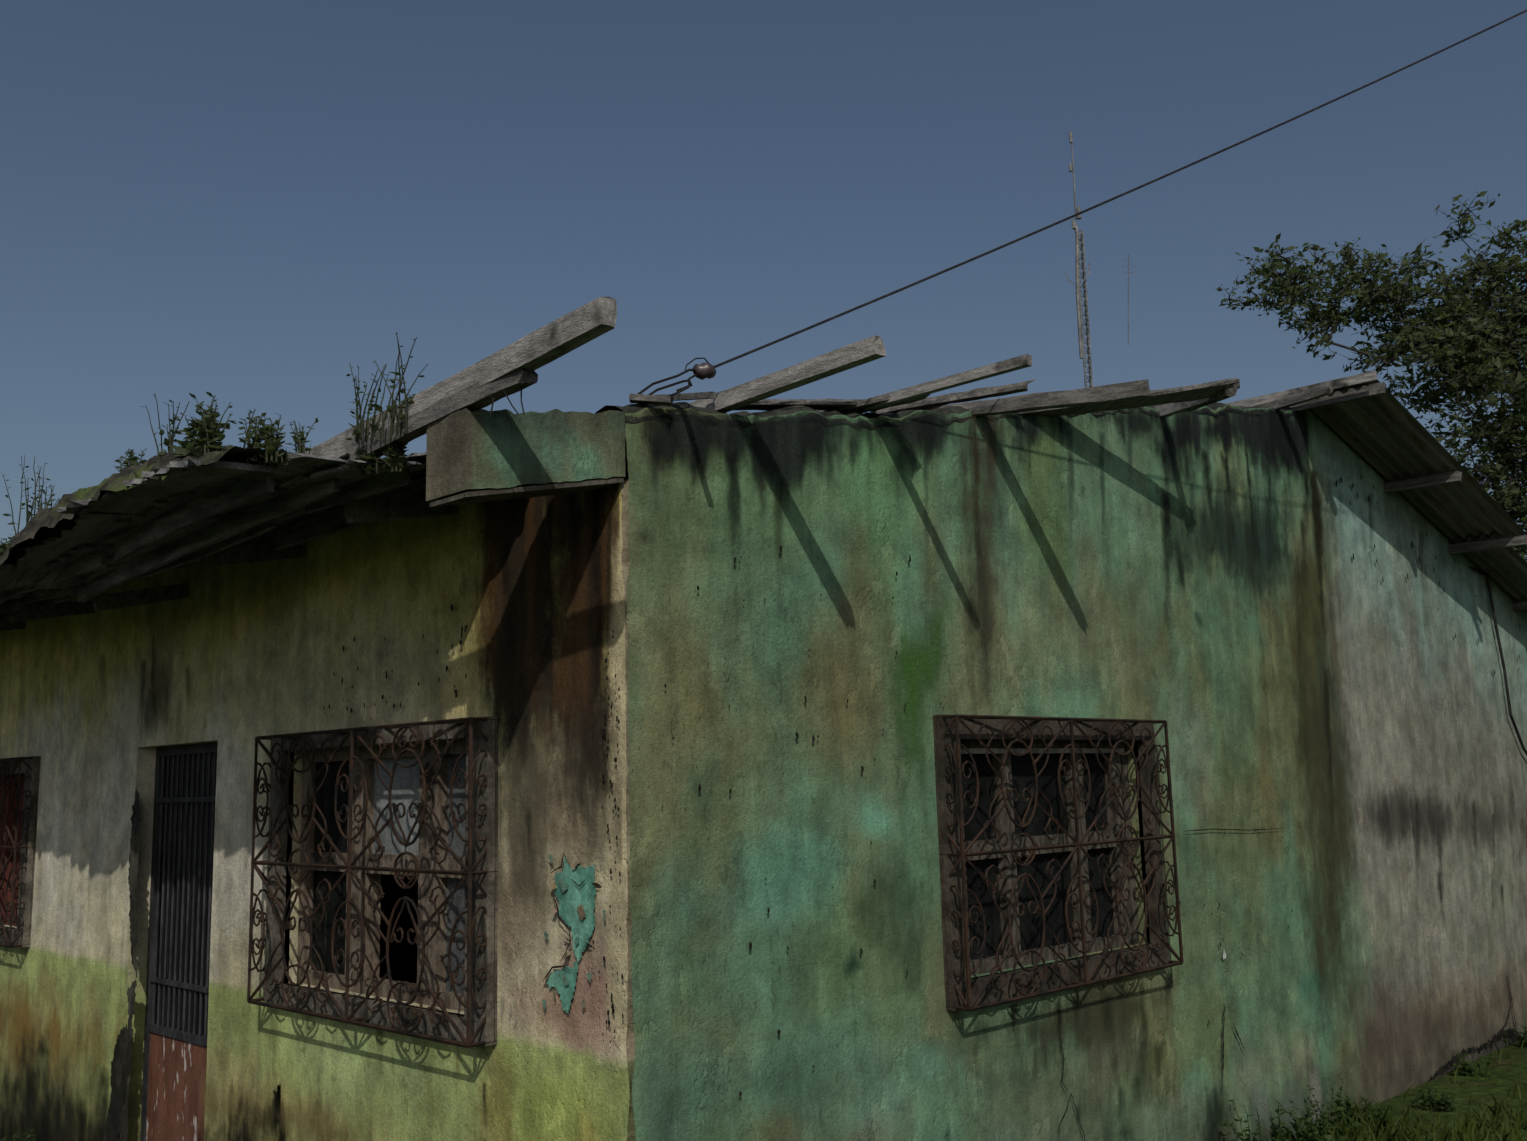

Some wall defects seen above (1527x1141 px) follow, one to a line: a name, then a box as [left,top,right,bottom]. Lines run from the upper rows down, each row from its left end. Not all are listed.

water stain [644,408,948,519]
water stain [965,415,1002,657]
spalling [601,630,621,843]
peeling [542,852,624,1043]
water stain [0,1041,106,1141]
water stain [228,1099,286,1141]